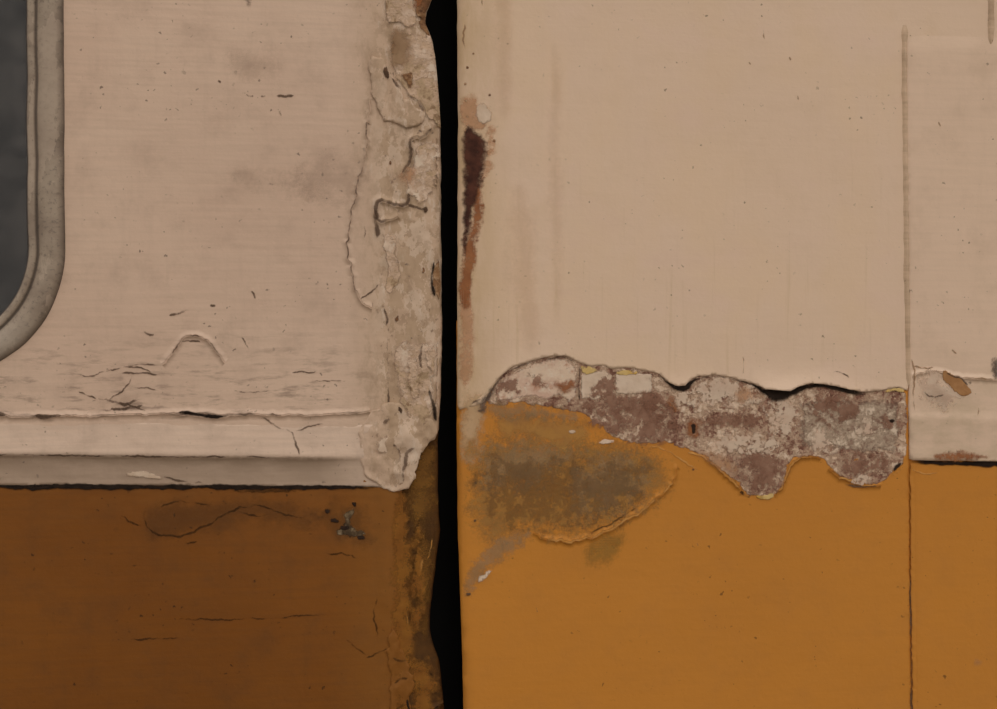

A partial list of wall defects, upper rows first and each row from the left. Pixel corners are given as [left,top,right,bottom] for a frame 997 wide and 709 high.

peeling [368,0,441,128]
peeling [422,261,441,299]
rust [459,94,495,384]
crack [126,452,224,460]
crack [0,329,390,454]
peeling [394,341,439,424]
peeling [460,356,908,500]
peeling [917,368,971,412]
crack [0,484,367,543]